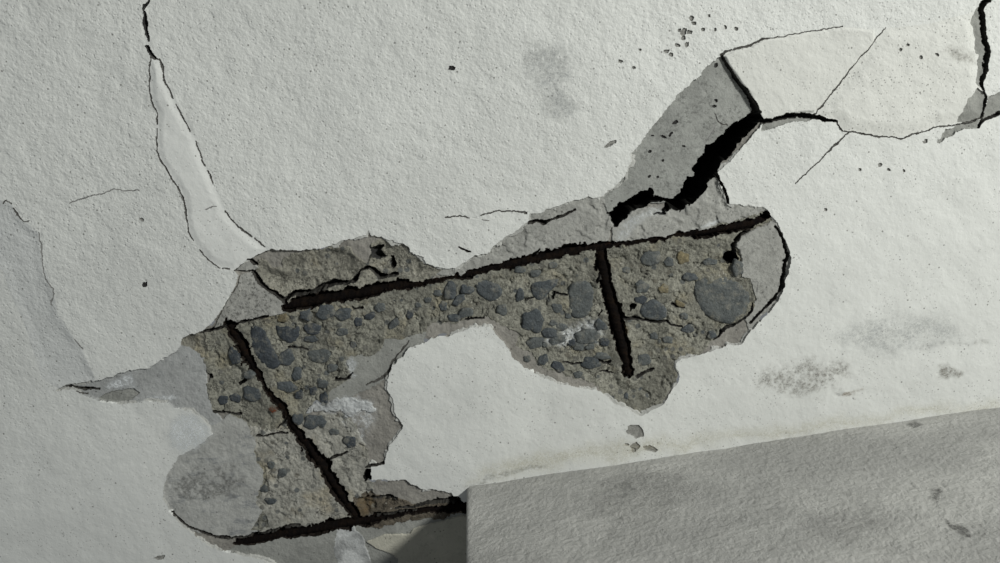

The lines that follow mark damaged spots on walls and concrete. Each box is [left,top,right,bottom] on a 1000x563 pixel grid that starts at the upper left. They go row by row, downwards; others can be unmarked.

peeling [663,15,738,57]
crack [703,0,1000,184]
crack [142,0,399,333]
crack [713,172,729,204]
crack [445,208,576,225]
crack [3,200,55,306]
crack [713,225,790,340]
spalling [56,57,812,563]
crack [620,312,683,328]
crack [366,340,409,386]
crack [365,460,385,468]
crack [171,510,301,539]